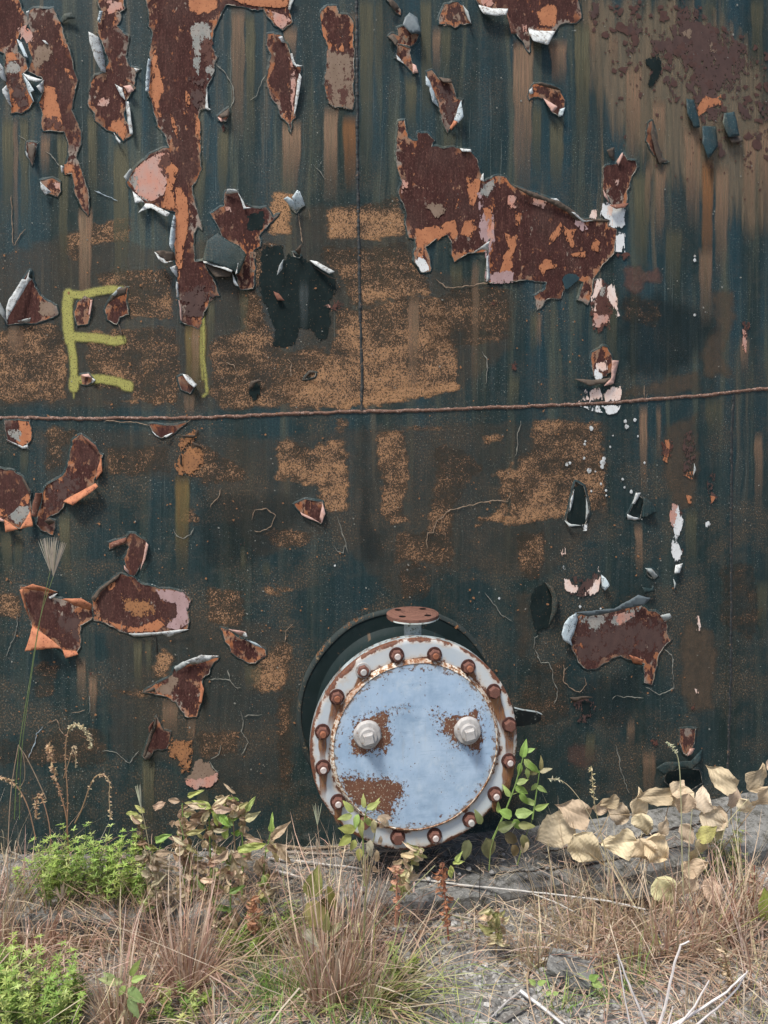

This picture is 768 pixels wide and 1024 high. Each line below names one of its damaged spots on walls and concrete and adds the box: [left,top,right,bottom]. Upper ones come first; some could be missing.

peeling [0,0,306,337]
peeling [318,4,356,112]
peeling [385,0,639,415]
rust [550,0,768,230]
rust [0,192,508,533]
peeling [0,433,105,537]
rust [474,398,618,578]
peeling [18,531,193,658]
peeling [562,567,673,687]
rust [348,704,410,757]
rust [428,696,519,755]
rust [334,768,409,824]